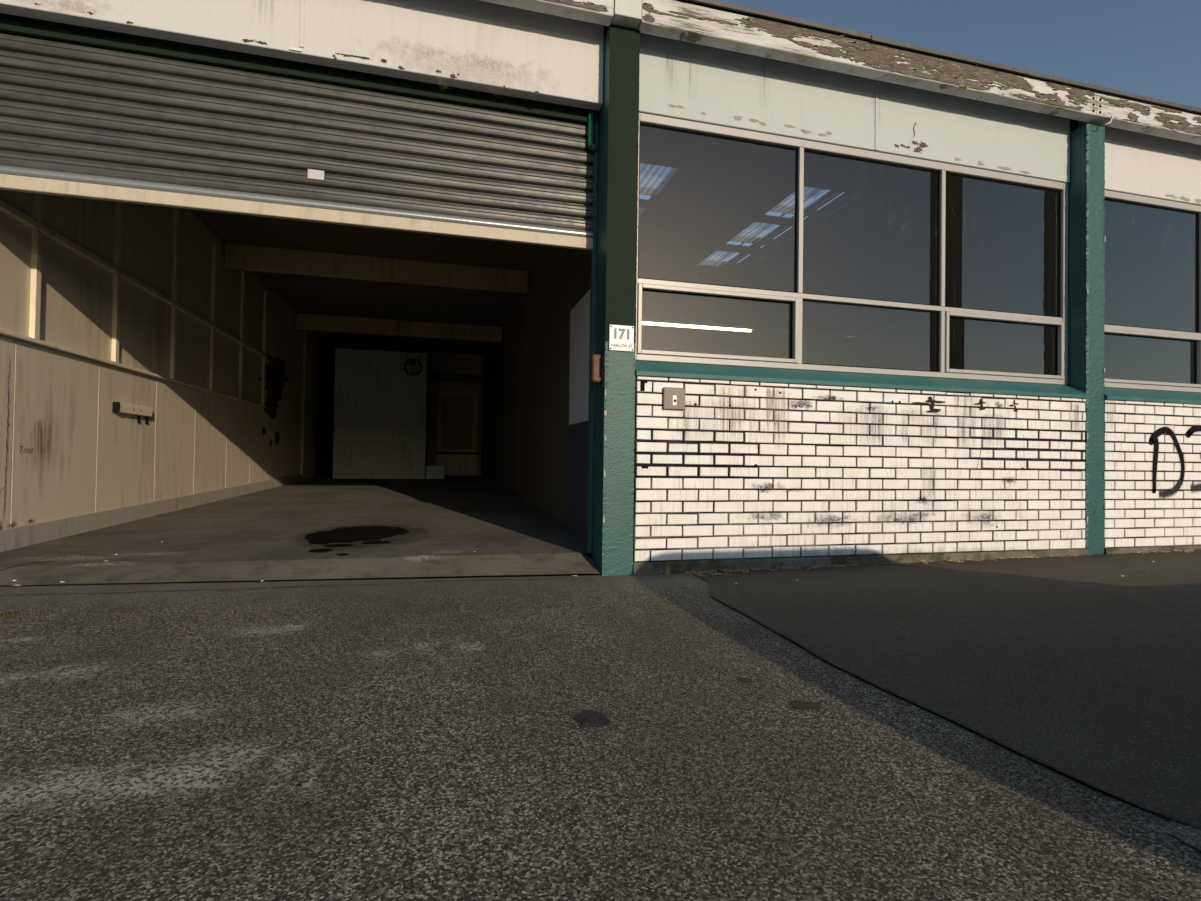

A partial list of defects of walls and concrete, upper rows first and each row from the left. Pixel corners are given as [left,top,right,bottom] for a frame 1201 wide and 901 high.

peeling [642,2,1201,135]
spalling [894,141,928,153]